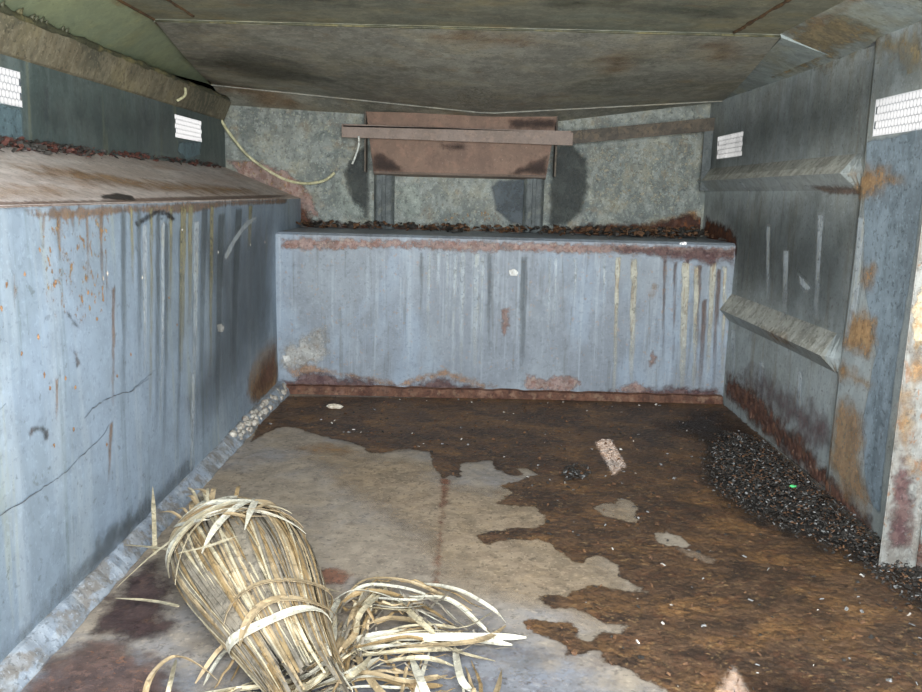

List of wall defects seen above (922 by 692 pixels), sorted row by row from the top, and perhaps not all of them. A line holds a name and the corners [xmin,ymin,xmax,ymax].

rust [0,161,737,329]
rust [843,314,875,357]
rust [911,287,922,349]
crack [0,370,155,516]
rust [249,354,922,692]